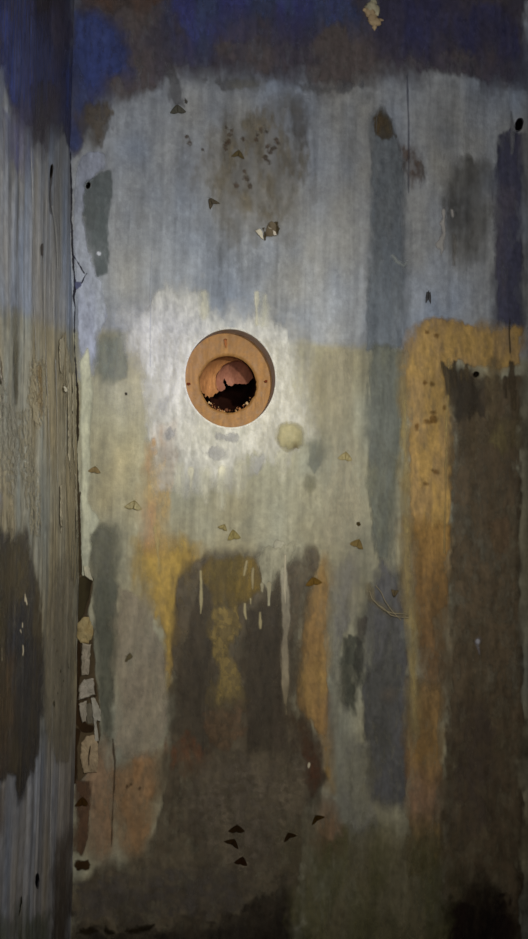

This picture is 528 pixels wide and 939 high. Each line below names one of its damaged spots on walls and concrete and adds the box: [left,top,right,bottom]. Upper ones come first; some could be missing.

damp [0,331,57,797]
crack [70,152,87,575]
peeling [59,333,101,783]
corrosion [138,426,198,680]
damp [52,152,325,939]
damp [217,116,303,220]
damp [0,0,525,153]
spalling [255,221,280,240]
corrosion [401,318,523,869]
damp [440,358,525,939]
damp [495,114,524,327]